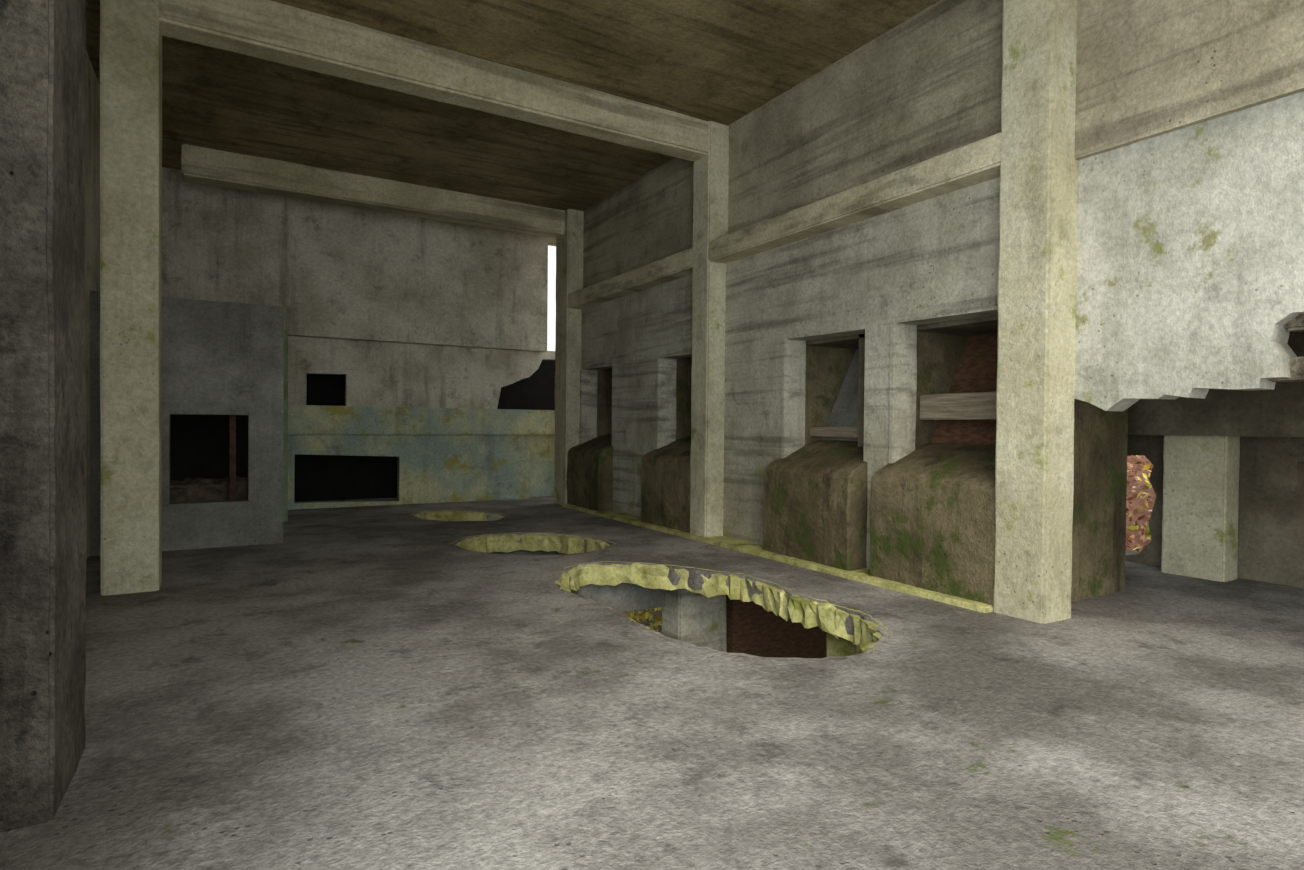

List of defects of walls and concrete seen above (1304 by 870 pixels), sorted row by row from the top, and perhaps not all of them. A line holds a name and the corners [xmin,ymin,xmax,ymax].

spalling [410,509,890,657]